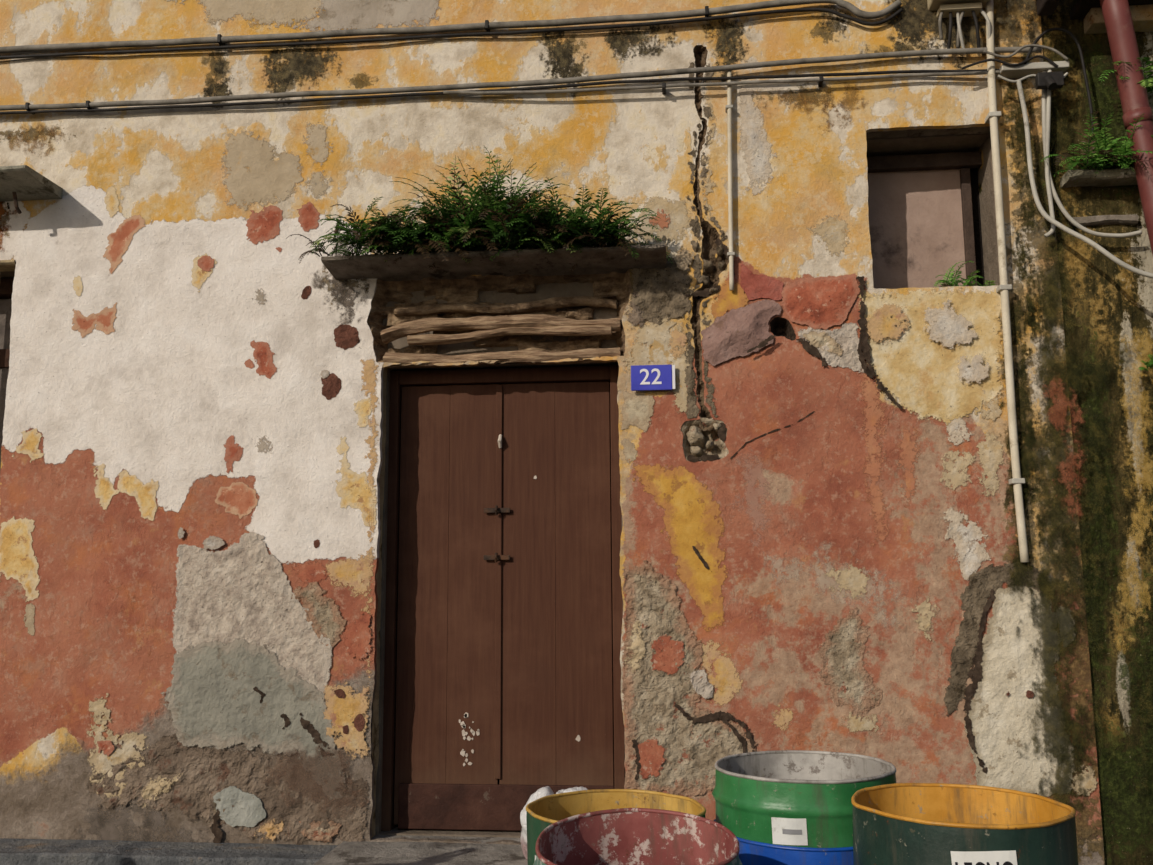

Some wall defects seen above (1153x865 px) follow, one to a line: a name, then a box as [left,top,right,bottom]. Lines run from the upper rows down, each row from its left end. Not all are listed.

leakage [263,39,341,105]
leakage [540,31,589,97]
leakage [605,25,675,60]
leakage [702,13,748,82]
crack [684,45,735,431]
spalling [171,359,379,760]
spalling [620,196,757,796]
crack [730,411,815,459]
peeling [770,317,921,546]
spalling [86,693,370,845]
crack [674,704,755,753]
crack [963,589,996,774]